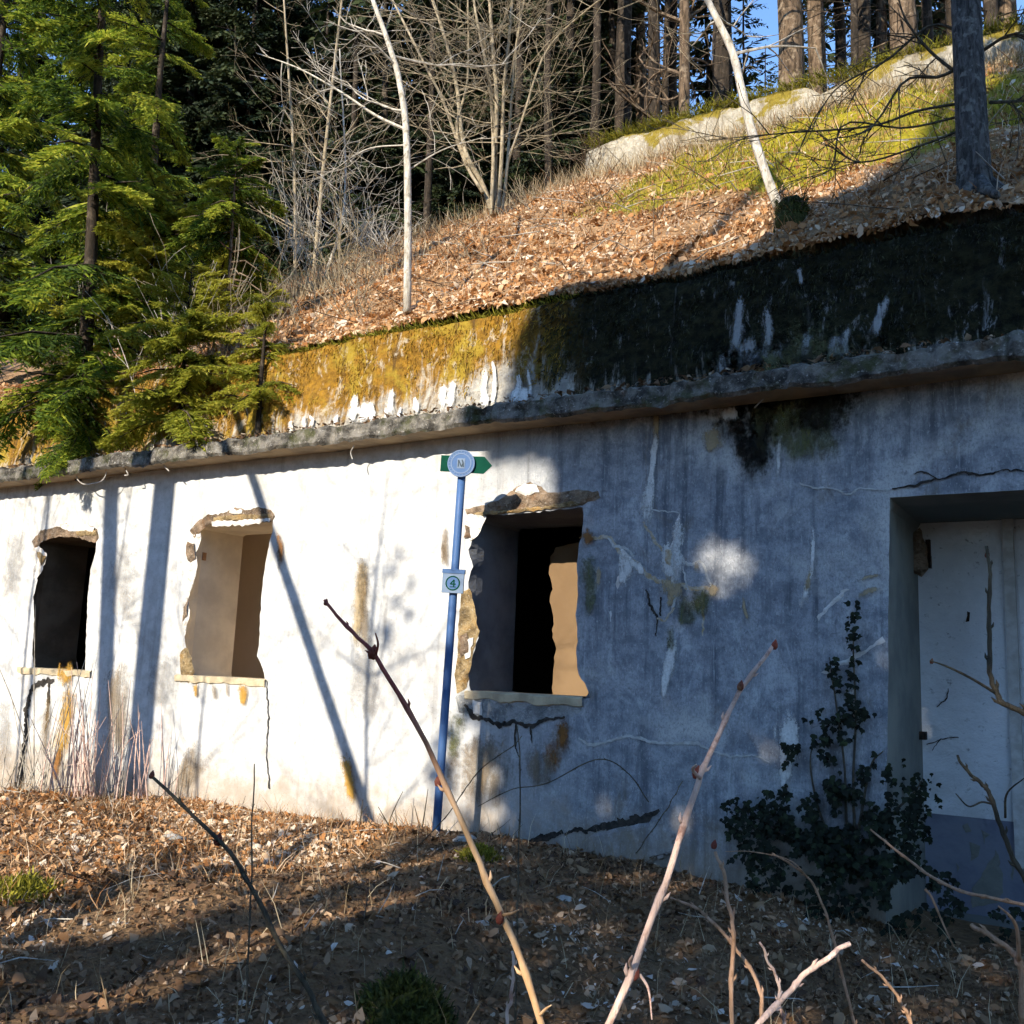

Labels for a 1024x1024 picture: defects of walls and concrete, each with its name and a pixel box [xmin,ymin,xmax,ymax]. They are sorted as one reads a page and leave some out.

water stain [702,300,866,376]
water stain [333,389,419,423]
water stain [438,379,456,411]
water stain [480,361,497,406]
water stain [701,392,859,479]
crack [800,469,1024,495]
spalling [454,589,582,725]
crack [14,677,54,789]
corrosion [41,664,76,778]
corrosion [212,685,247,704]
crack [464,704,770,763]
crack [529,809,660,843]